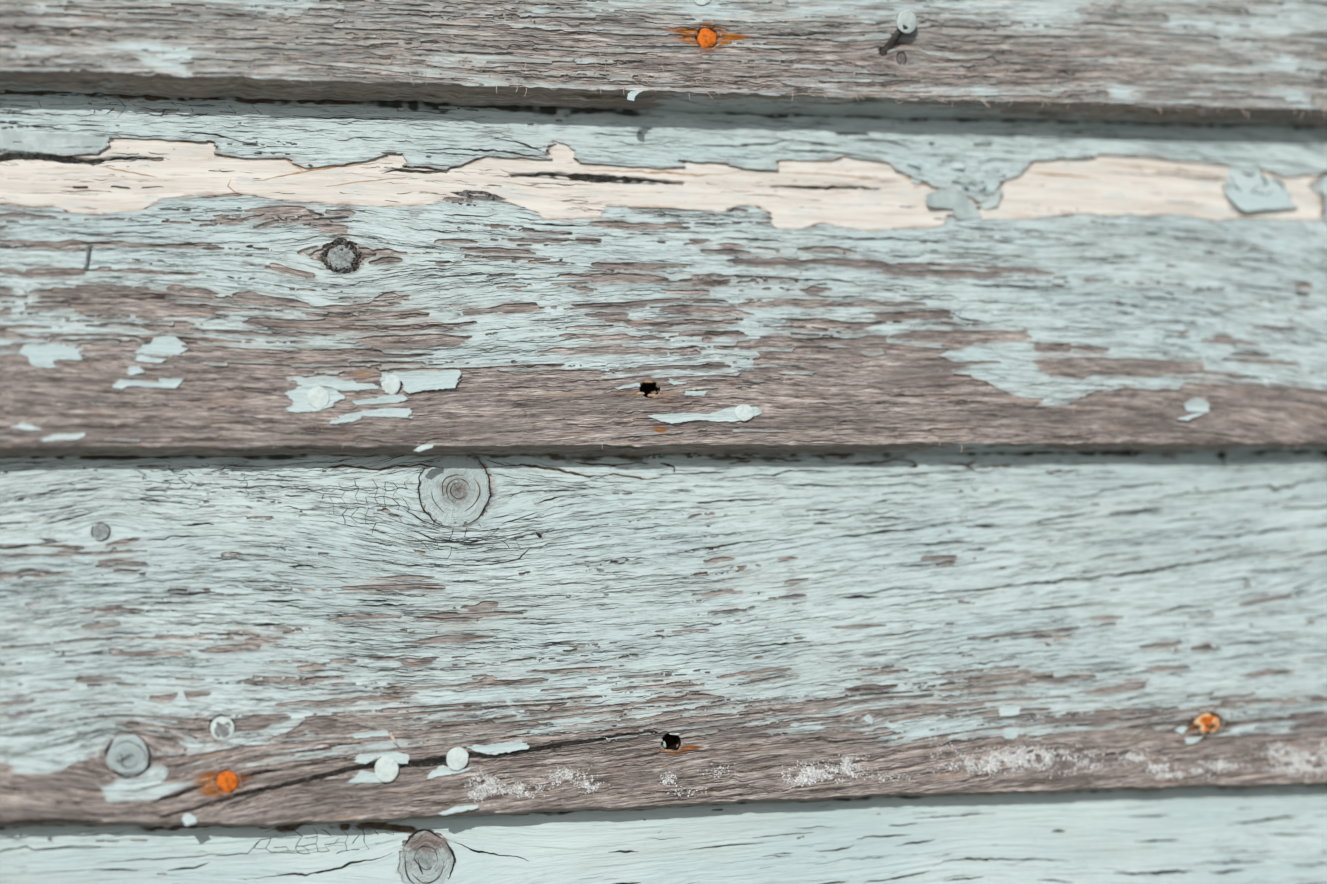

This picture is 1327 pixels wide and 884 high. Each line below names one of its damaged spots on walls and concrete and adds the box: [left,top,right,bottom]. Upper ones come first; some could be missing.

peeling [0,0,1327,109]
rust [666,22,749,51]
peeling [0,130,1327,230]
peeling [31,272,213,312]
peeling [0,330,1327,452]
peeling [921,555,957,565]
crack [0,455,1327,884]
peeling [1074,678,1149,694]
rust [1178,717,1233,738]
peeling [0,688,1327,826]
rust [196,772,254,797]